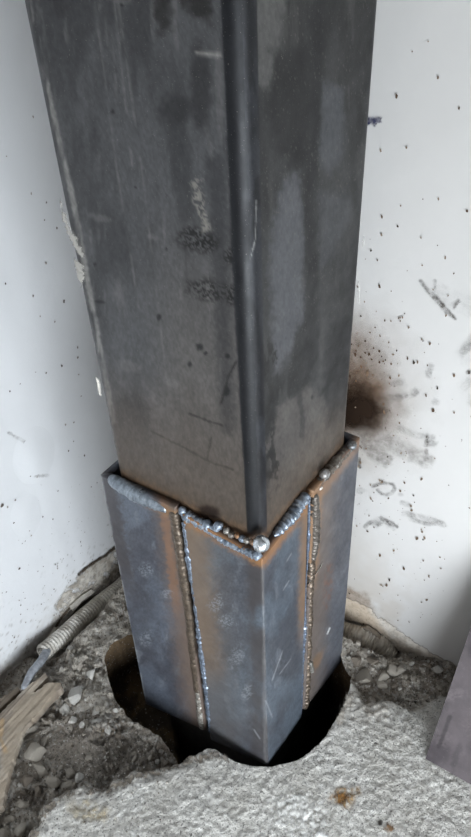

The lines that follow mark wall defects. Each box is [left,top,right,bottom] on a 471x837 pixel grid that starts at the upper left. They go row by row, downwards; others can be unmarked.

spalling [47,546,121,638]
flaking render [344,598,446,661]
spalling [337,693,354,725]
spalling [29,751,229,837]
rust [331,788,359,808]